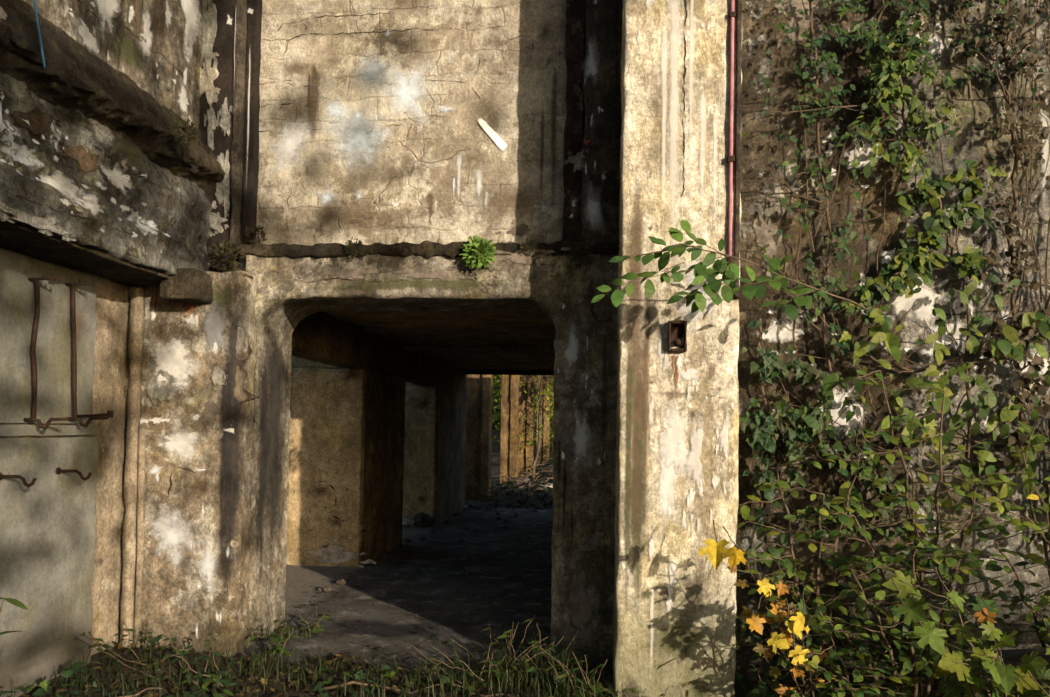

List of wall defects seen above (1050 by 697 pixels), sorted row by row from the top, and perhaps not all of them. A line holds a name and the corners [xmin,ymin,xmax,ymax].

peeling [70,0,159,79]
peeling [165,0,233,237]
damp [288,62,319,133]
crack [259,13,460,132]
spalling [0,90,170,241]
peeling [140,338,198,423]
peeling [211,366,228,390]
peeling [160,414,217,513]
peeling [649,334,734,534]
peeling [156,513,192,564]
peeling [197,547,214,588]
peeling [666,562,676,610]